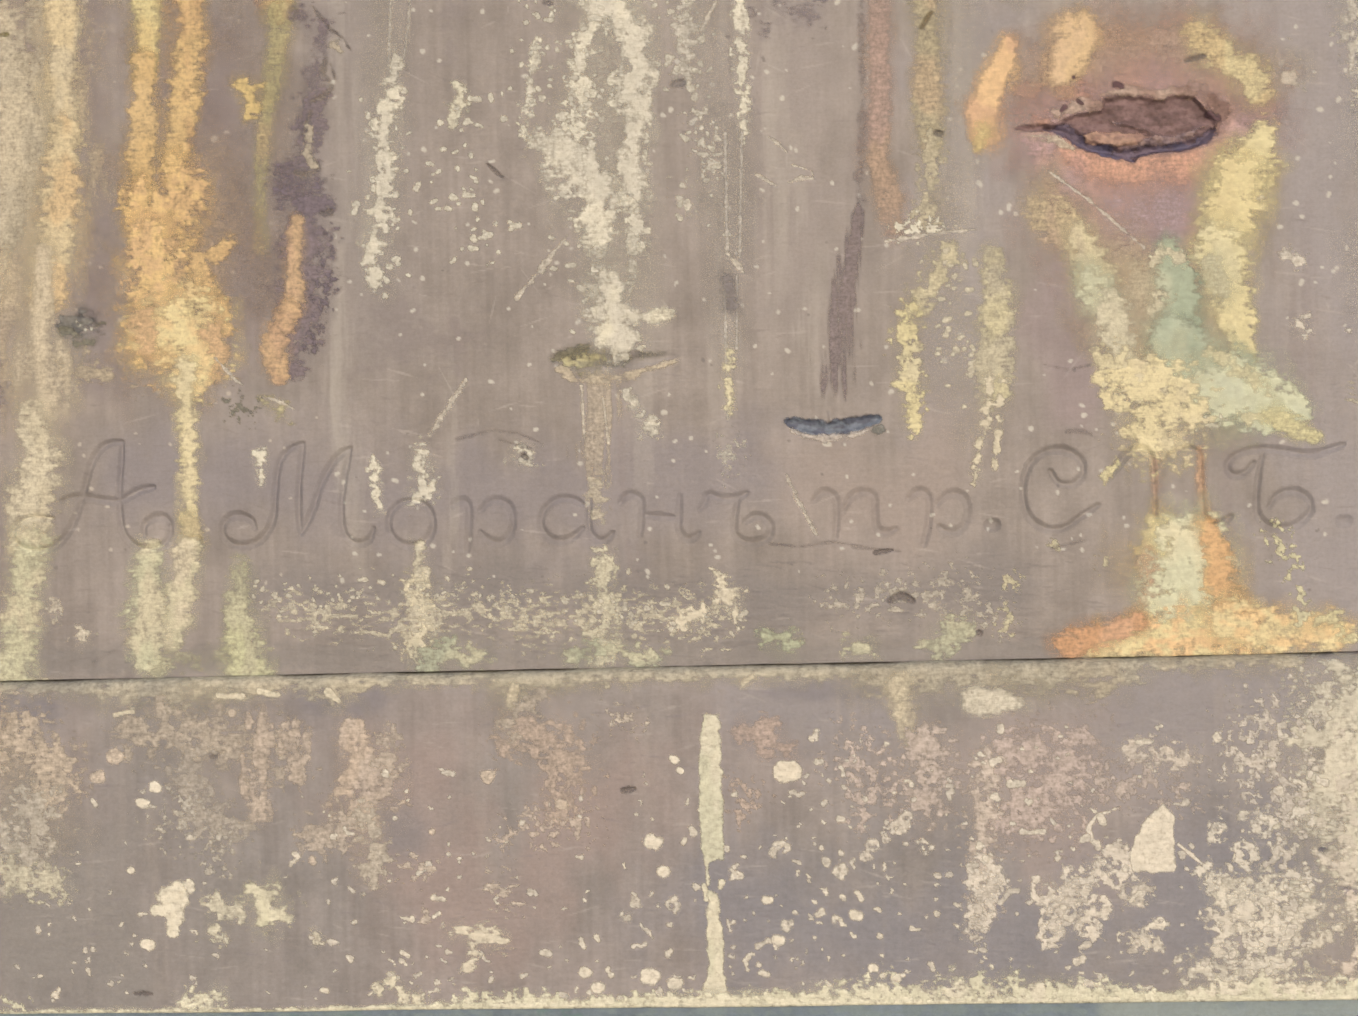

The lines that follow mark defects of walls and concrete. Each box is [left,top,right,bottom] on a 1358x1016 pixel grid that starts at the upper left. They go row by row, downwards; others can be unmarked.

water stain [150,0,183,195]
corrosion [113,0,240,651]
corrosion [232,0,296,233]
corrosion [222,215,306,425]
water stain [166,0,769,524]
spalling [784,415,885,443]
water stain [821,200,864,397]
corrosion [866,0,1017,487]
spalling [1015,81,1230,163]
corrosion [965,8,1285,364]
corrosion [1052,447,1357,658]